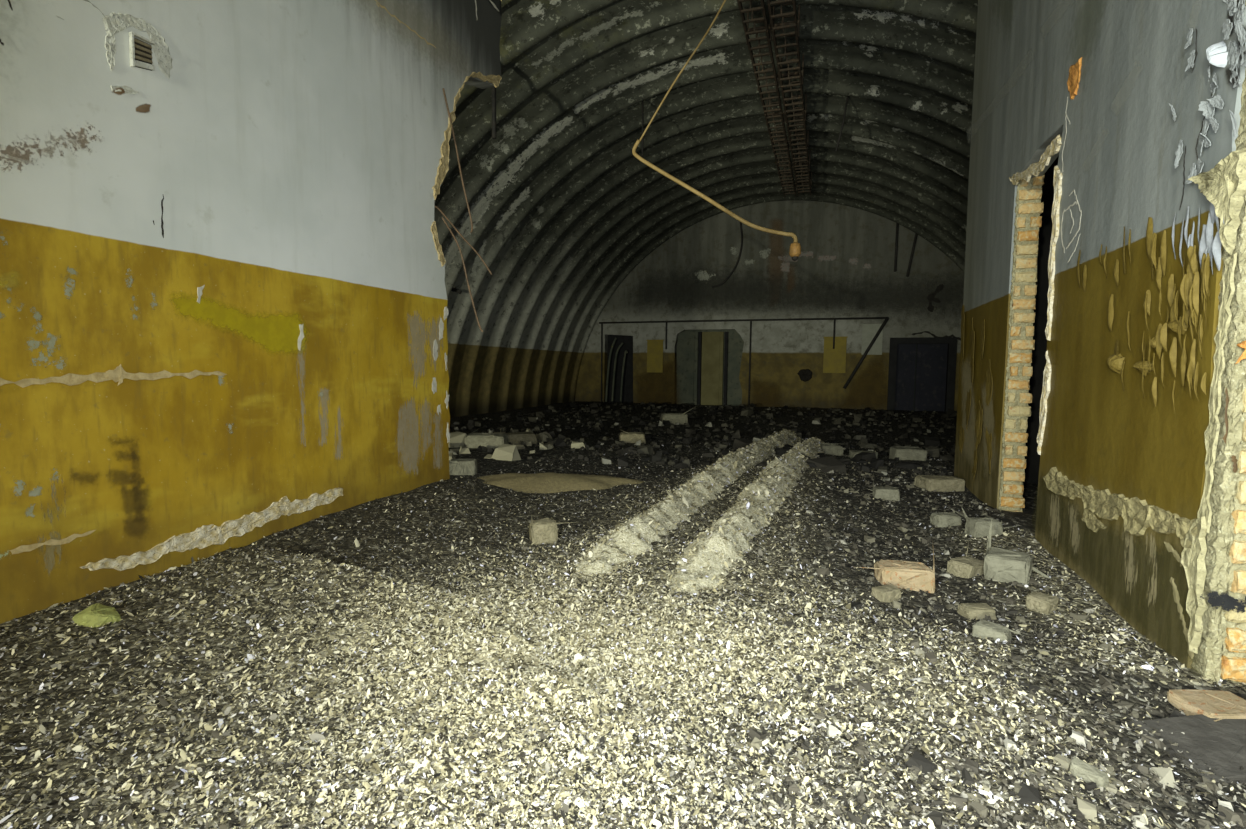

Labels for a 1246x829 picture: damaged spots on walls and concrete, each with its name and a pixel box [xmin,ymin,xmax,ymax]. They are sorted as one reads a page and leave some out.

peeling [527,0,561,20]
spalling [102,12,173,95]
peeling [63,267,78,299]
peeling [0,283,227,388]
peeling [1009,0,1246,654]
spalling [80,488,343,571]